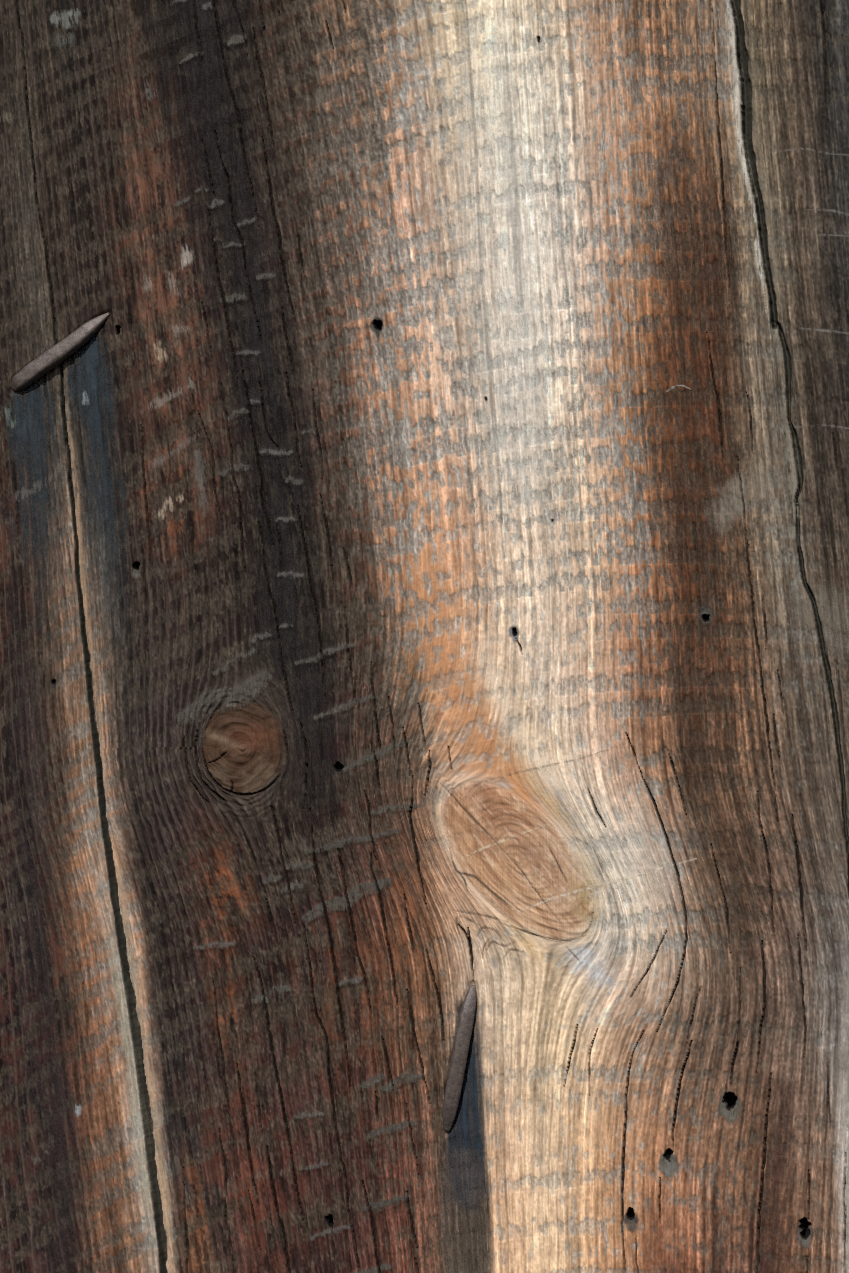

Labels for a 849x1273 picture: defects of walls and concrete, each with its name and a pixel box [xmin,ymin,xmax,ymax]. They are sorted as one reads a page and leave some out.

crack [18,1,188,1273]
crack [184,0,493,1273]
crack [449,847,579,982]
crack [621,1037,641,1273]
crack [626,732,695,1142]
crack [709,342,807,1271]
crack [712,0,849,883]
crack [841,1169,849,1256]